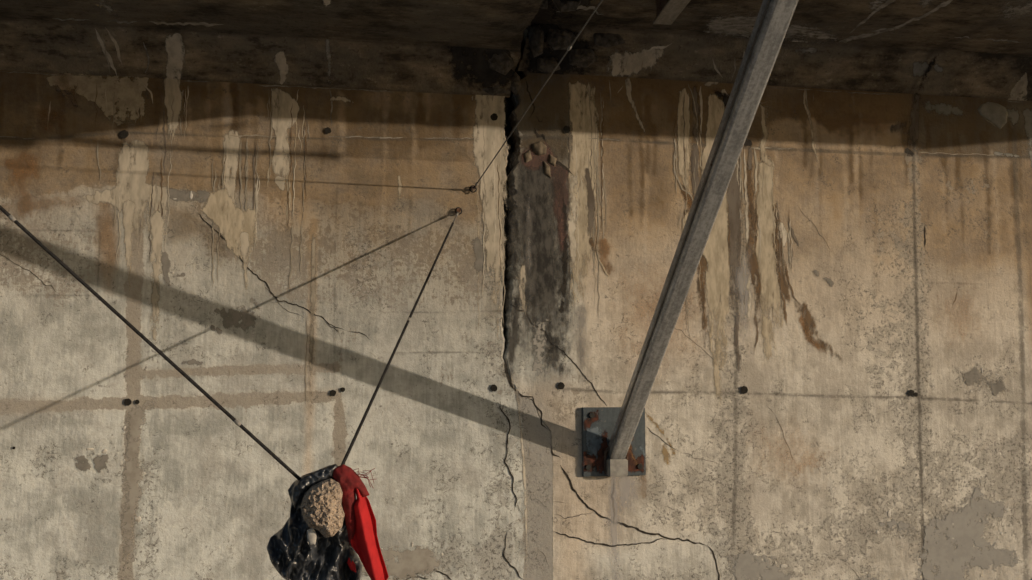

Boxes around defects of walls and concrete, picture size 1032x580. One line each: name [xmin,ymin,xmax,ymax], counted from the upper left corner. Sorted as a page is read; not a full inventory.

spalling [448,0,625,96]
crack [200,215,372,341]
leakage [201,39,403,399]
crack [502,0,548,335]
leakage [420,45,669,550]
crack [558,348,607,406]
rust [582,410,608,474]
crack [499,360,720,580]
rust [628,438,646,473]
leakage [673,51,745,229]
leakage [680,102,839,397]
peeling [876,476,1020,580]